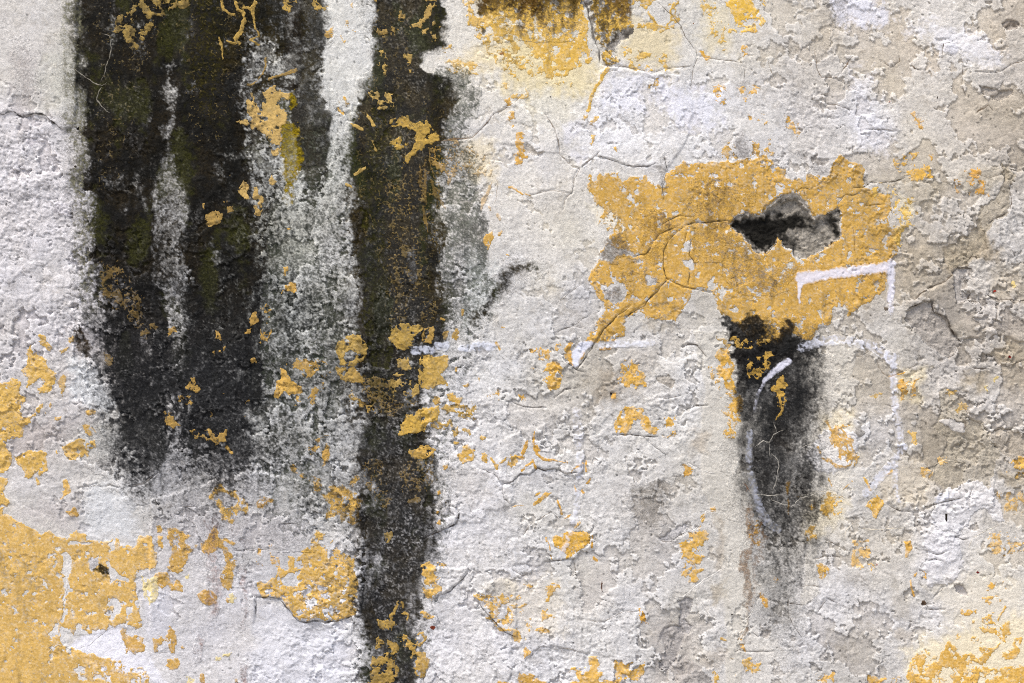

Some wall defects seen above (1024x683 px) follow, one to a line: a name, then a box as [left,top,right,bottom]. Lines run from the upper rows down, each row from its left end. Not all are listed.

peeling [0,334,205,683]
damp [11,0,549,683]
peeling [255,538,353,621]
crack [443,96,521,141]
damp [472,0,751,168]
crack [513,114,728,408]
peeling [582,0,680,145]
crack [584,1,774,81]
damp [598,177,848,672]
peeling [586,139,919,350]
damp [773,144,833,181]
peeling [865,581,1024,683]